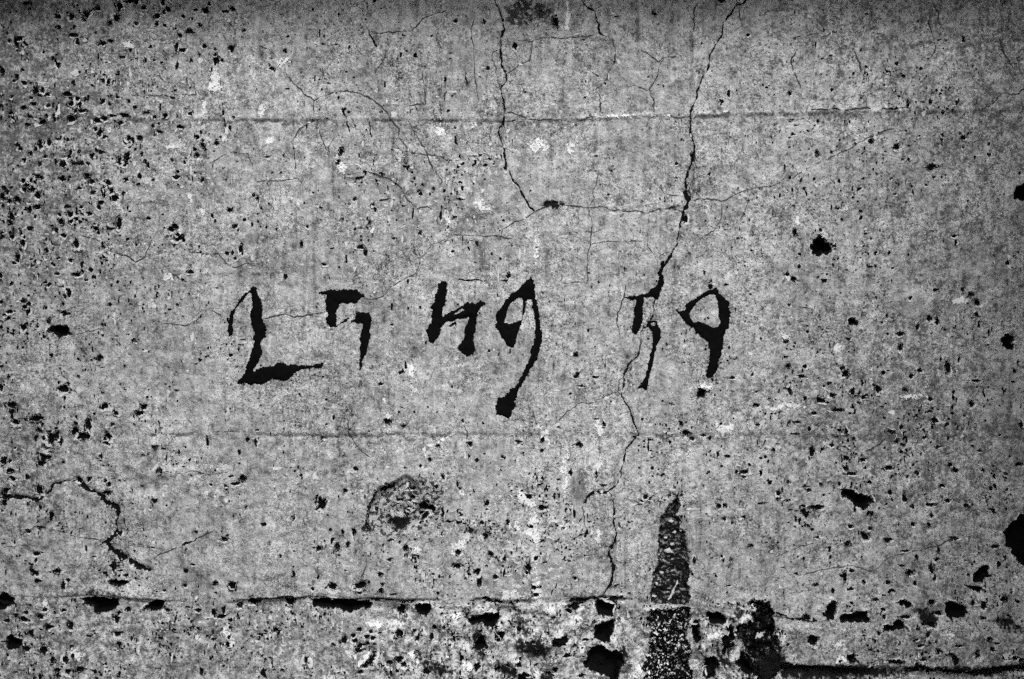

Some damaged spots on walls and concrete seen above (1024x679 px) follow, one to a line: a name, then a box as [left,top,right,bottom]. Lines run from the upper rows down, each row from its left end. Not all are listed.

crack [367,0,933,300]
crack [0,479,213,576]
crack [503,285,676,595]